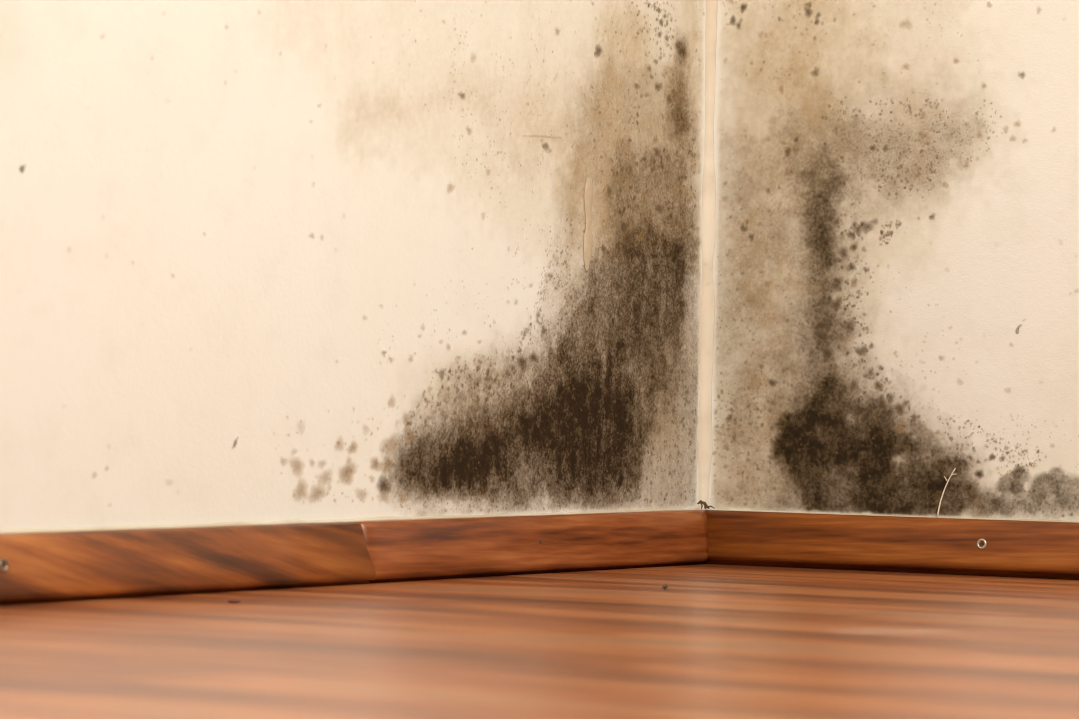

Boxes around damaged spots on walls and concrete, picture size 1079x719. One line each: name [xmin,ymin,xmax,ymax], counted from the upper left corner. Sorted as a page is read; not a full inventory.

water stain [648,4,691,133]
water stain [373,64,699,509]
water stain [771,149,1004,515]